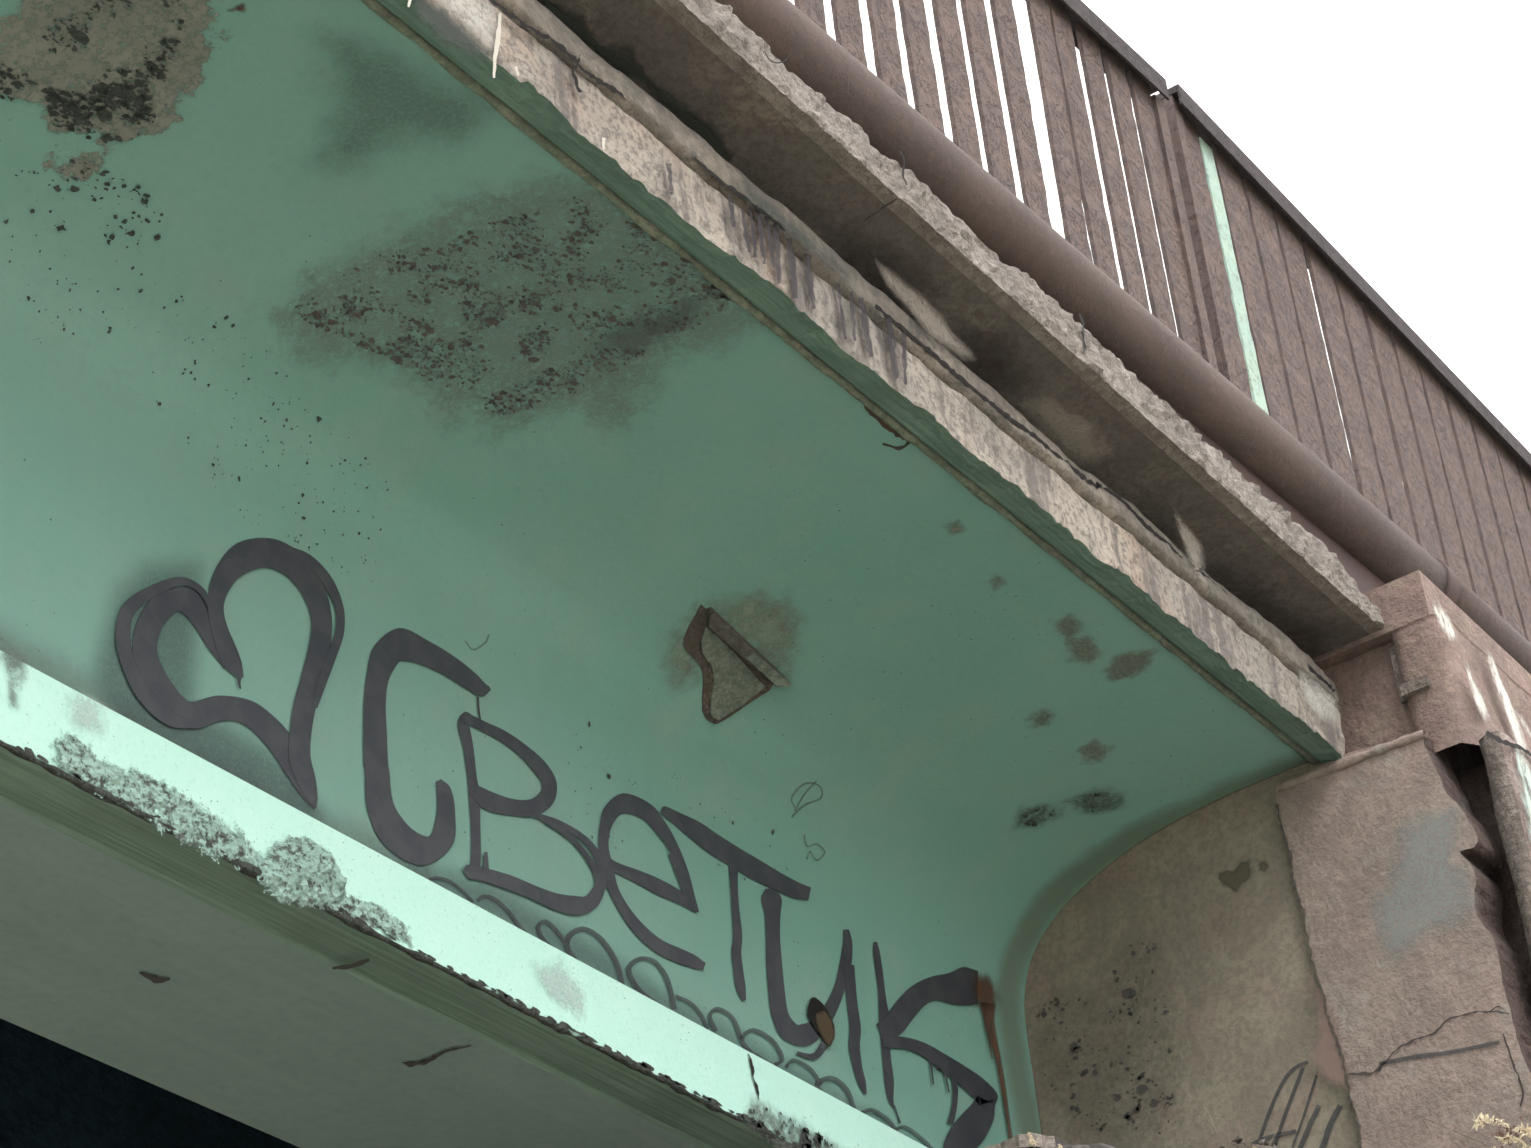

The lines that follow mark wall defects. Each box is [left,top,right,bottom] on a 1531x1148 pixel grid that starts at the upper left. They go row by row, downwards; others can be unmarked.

peeling [0,0,228,245]
water stain [728,188,907,385]
spalling [671,595,794,724]
spalling [0,740,177,836]
spalling [206,839,264,881]
water stain [1019,806,1055,826]
spalling [314,904,800,1148]
rust [975,976,1012,1139]
crack [1275,804,1524,1148]